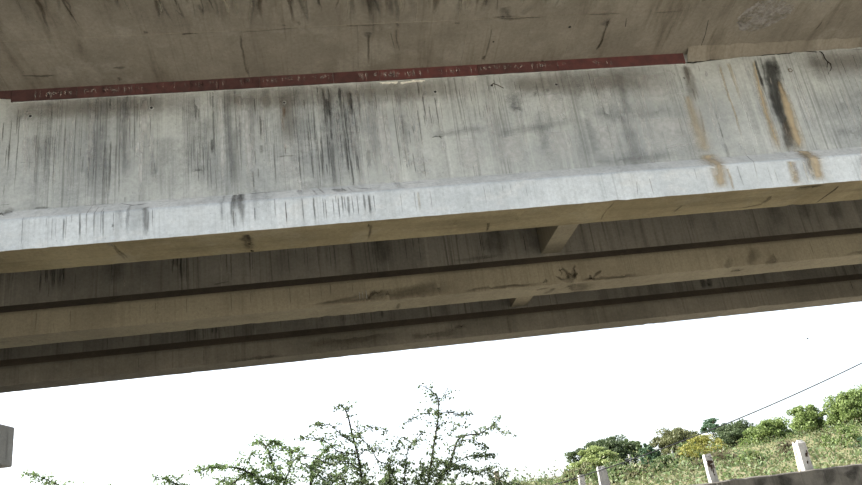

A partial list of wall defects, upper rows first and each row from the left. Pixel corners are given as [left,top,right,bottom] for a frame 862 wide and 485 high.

damp [313,89,399,184]
rust [754,62,822,180]